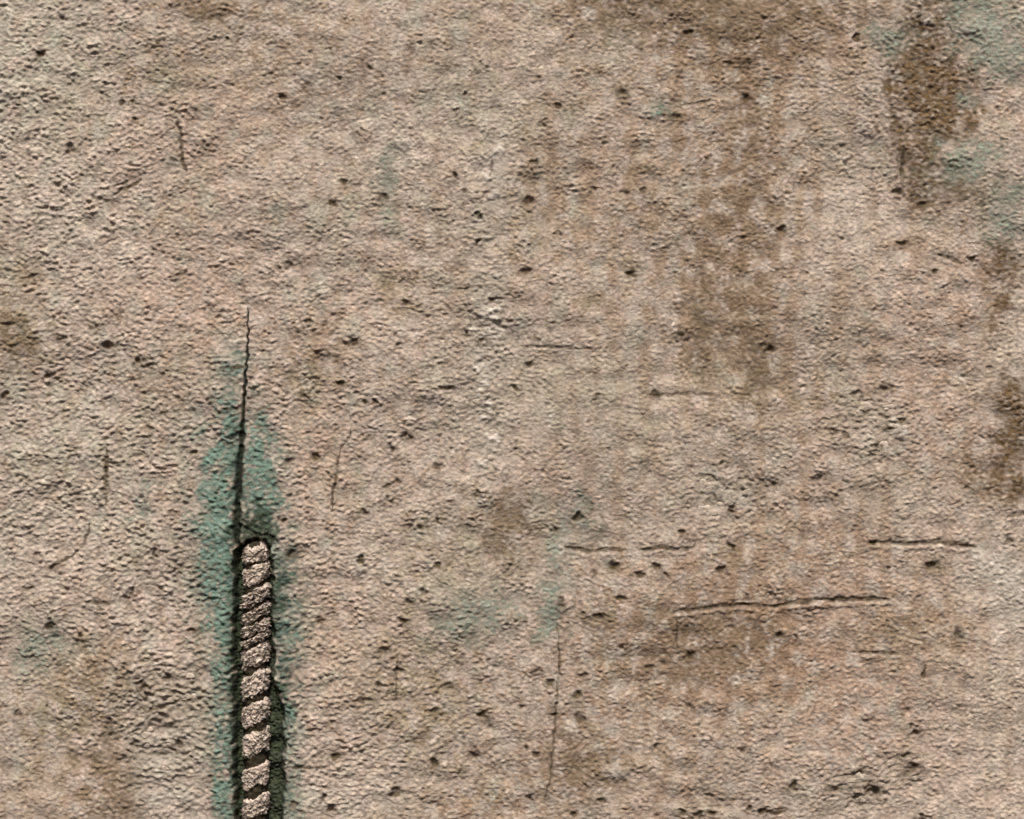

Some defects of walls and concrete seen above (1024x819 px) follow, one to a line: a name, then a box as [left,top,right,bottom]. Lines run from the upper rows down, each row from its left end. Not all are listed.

leakage [181,350,305,819]
crack [220,311,275,544]
spalling [231,539,294,819]
crack [673,597,879,646]
crack [875,539,974,547]